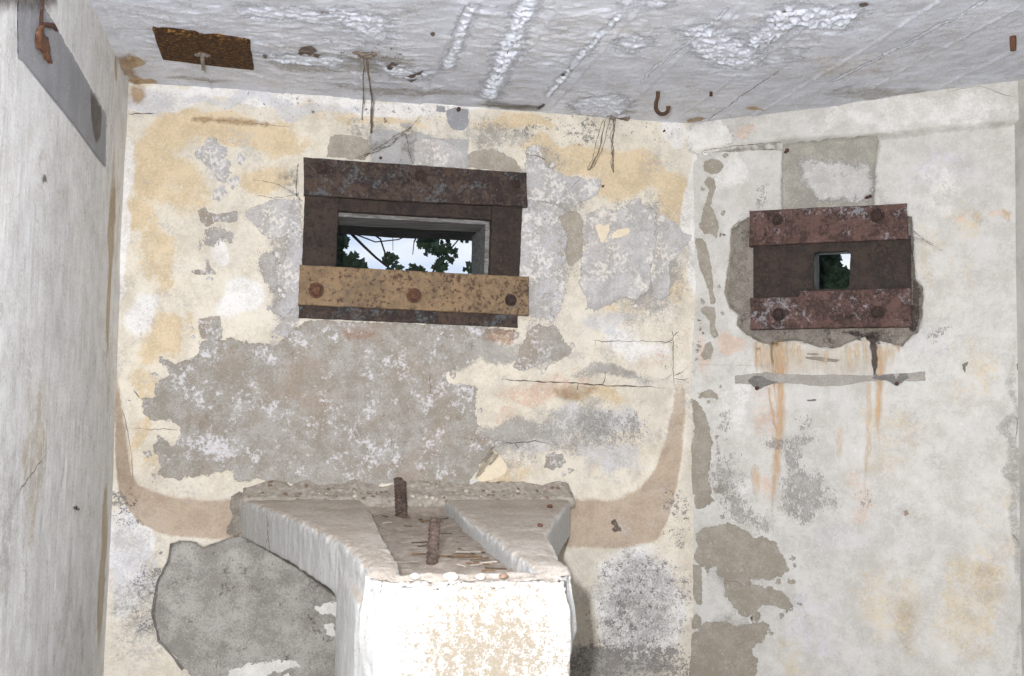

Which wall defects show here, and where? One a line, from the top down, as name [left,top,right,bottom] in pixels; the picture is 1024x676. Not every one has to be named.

leakage [194,117,268,126]
crack [506,332,706,390]
peeling [142,105,951,676]
leakage [112,491,144,527]
leakage [663,495,690,548]